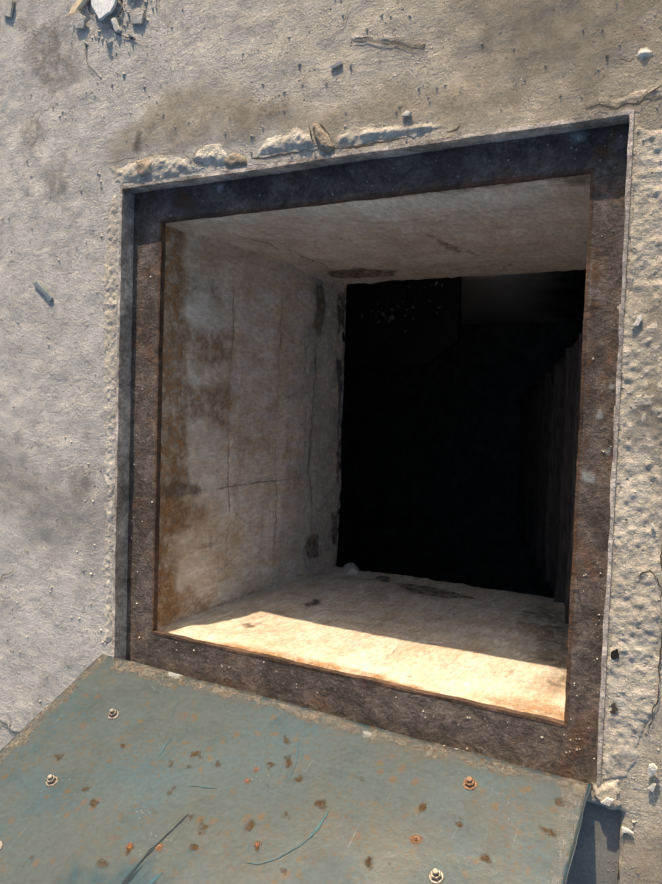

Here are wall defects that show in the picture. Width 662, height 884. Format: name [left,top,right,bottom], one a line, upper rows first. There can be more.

crack [585,80,662,117]
crack [106,145,225,167]
crack [252,137,407,159]
crack [209,272,317,577]
rust [151,168,599,728]
crack [637,526,662,598]
crack [644,619,662,735]